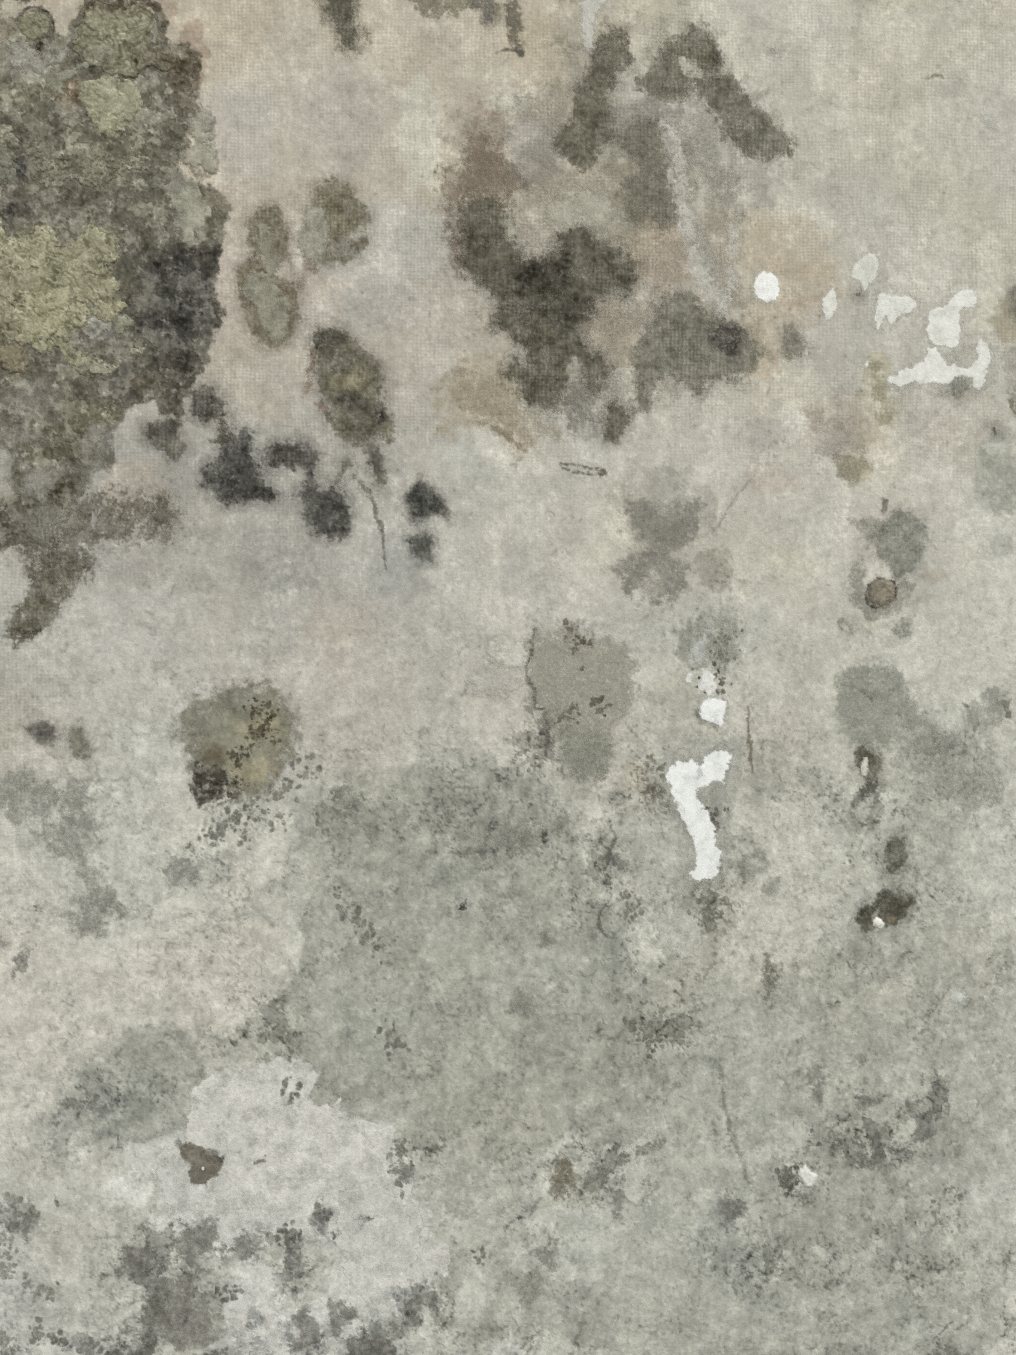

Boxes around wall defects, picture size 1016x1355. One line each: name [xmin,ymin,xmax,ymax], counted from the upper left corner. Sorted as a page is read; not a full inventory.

leakage [413,0,524,57]
mould [556,24,793,229]
leakage [0,0,394,649]
leakage [434,137,759,451]
mould [784,324,805,359]
peeling [822,287,838,320]
peeling [851,253,1016,414]
mould [406,481,448,561]
peeling [650,626,745,889]